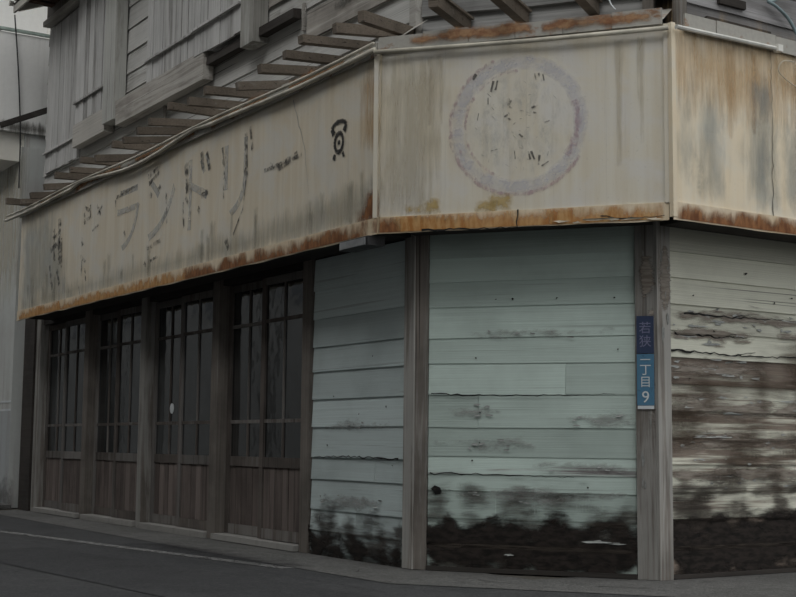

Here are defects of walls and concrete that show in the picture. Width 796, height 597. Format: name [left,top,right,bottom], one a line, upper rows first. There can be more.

corrosion [411,22,531,43]
corrosion [542,13,649,31]
corrosion [680,205,796,234]
corrosion [19,192,660,319]
peeling [659,246,796,347]
peeling [671,359,764,381]
leakage [308,505,402,567]
leakage [426,492,638,579]
leakage [673,474,796,579]